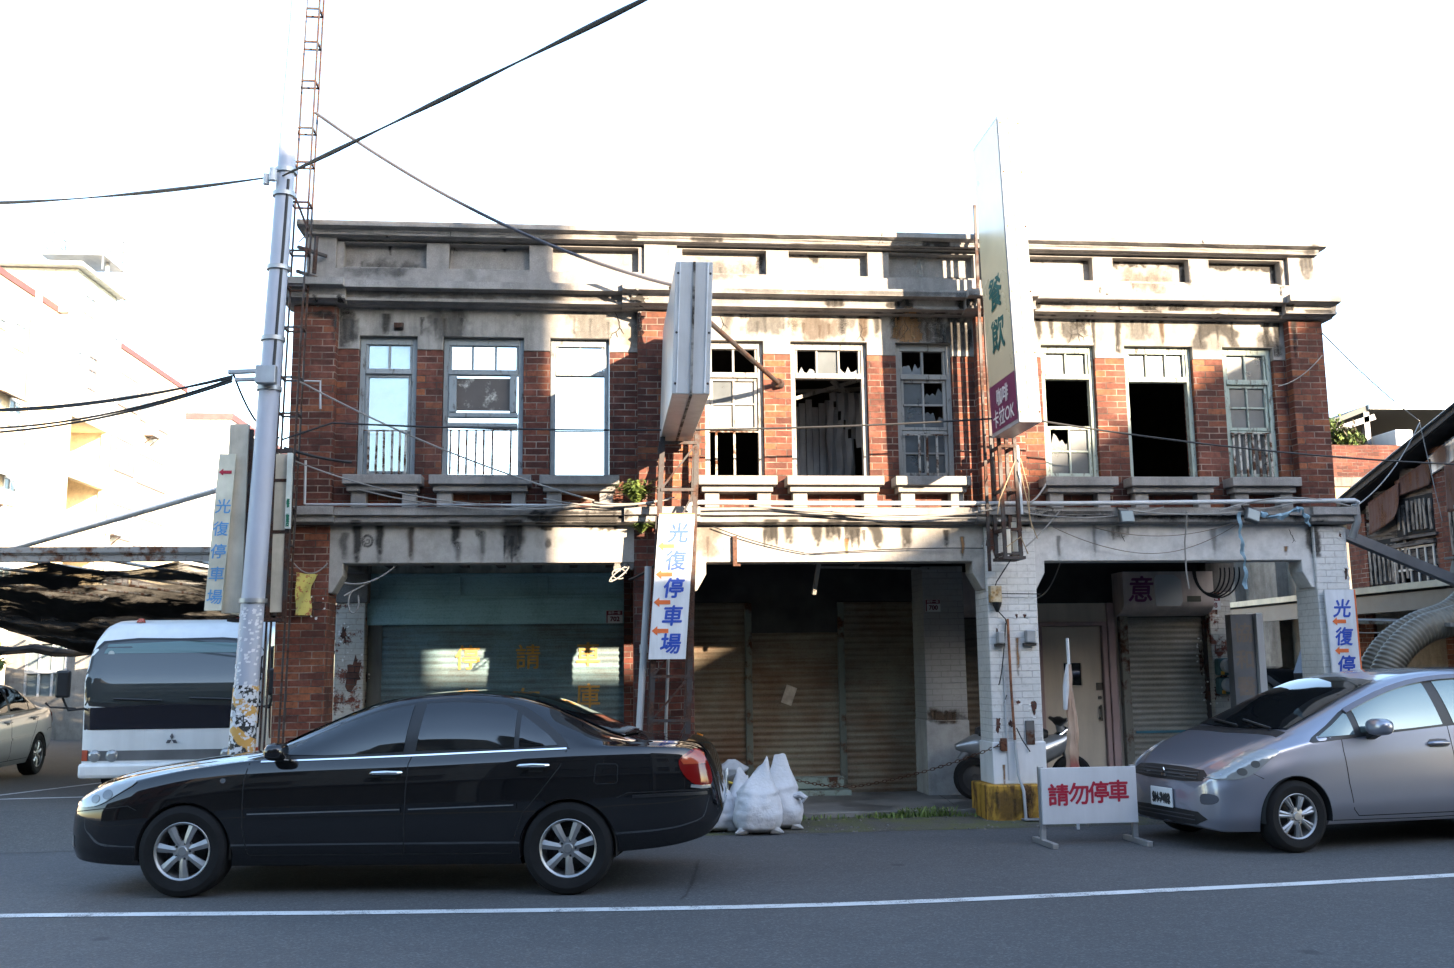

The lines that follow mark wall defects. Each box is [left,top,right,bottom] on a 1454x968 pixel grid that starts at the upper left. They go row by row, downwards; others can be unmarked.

water stain [1112,262,1192,285]
water stain [1208,244,1316,285]
water stain [724,310,796,334]
water stain [874,296,984,350]
water stain [1035,302,1096,345]
water stain [1115,316,1123,353]
water stain [1193,317,1239,349]
water stain [1258,304,1331,357]
water stain [341,520,384,563]
water stain [764,519,883,561]
water stain [901,522,913,547]
peeling [338,623,370,695]